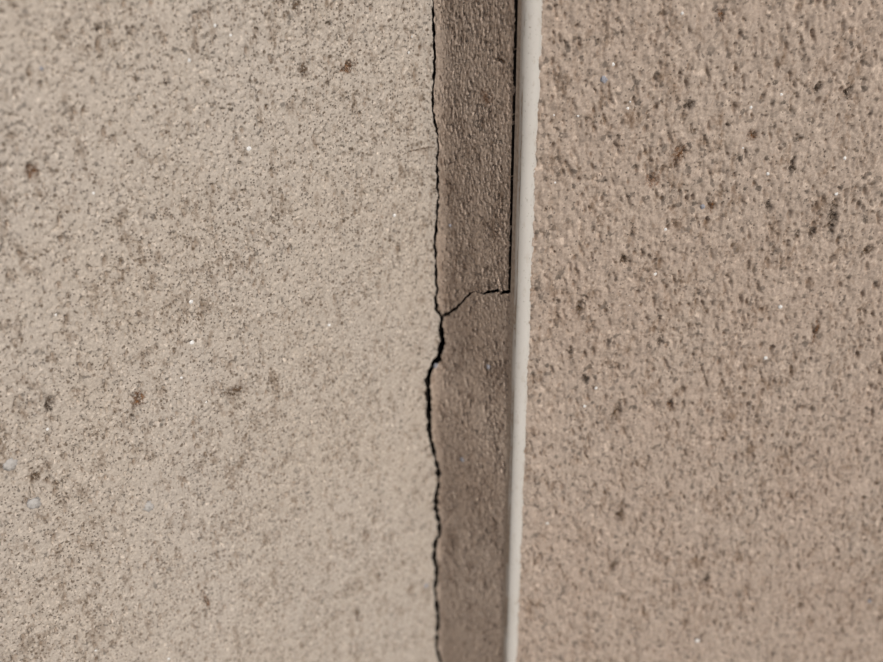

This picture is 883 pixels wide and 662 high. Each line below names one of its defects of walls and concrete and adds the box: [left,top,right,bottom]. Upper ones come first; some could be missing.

crack [403,0,509,662]